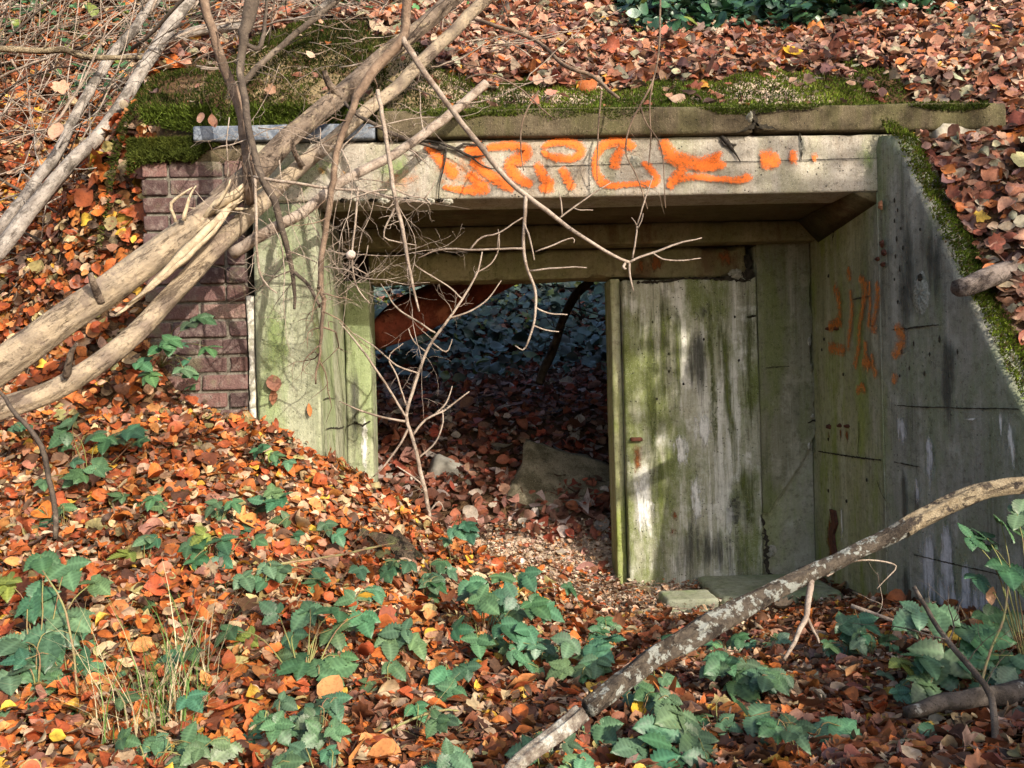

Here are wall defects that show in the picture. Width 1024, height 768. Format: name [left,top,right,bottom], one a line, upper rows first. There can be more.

leakage [351,375,367,464]
leakage [636,302,755,534]
leakage [685,470,755,568]